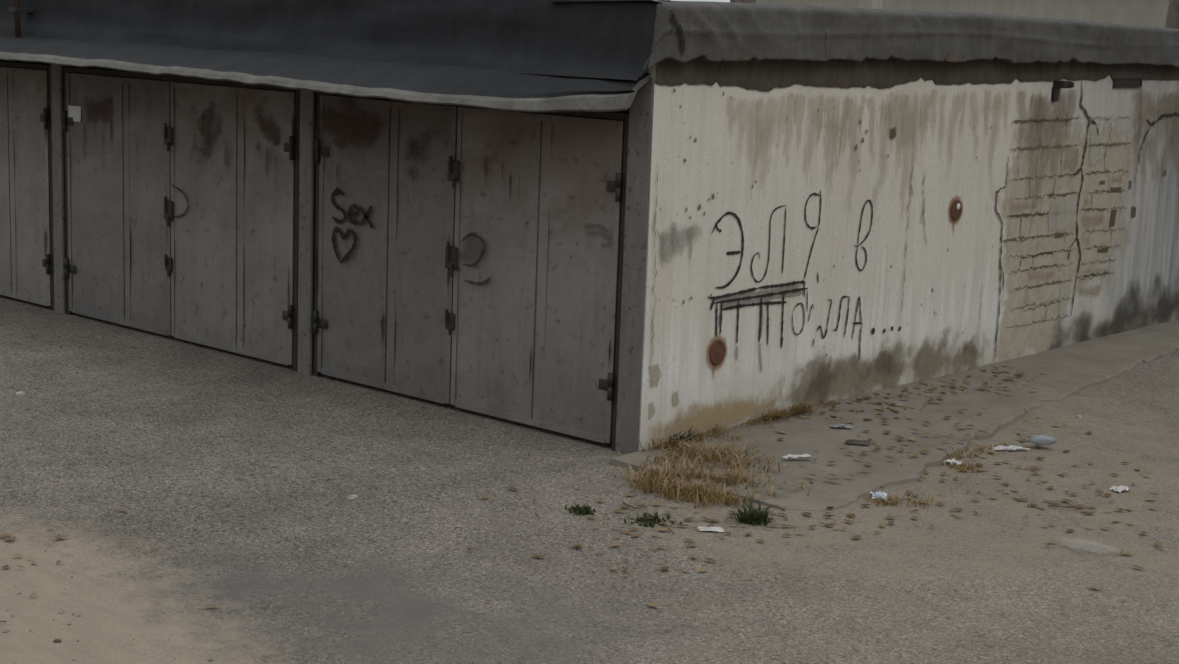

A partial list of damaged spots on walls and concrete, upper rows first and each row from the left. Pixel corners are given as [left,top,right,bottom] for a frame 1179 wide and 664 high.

spalling [992,115,1138,360]
water stain [1076,279,1179,342]